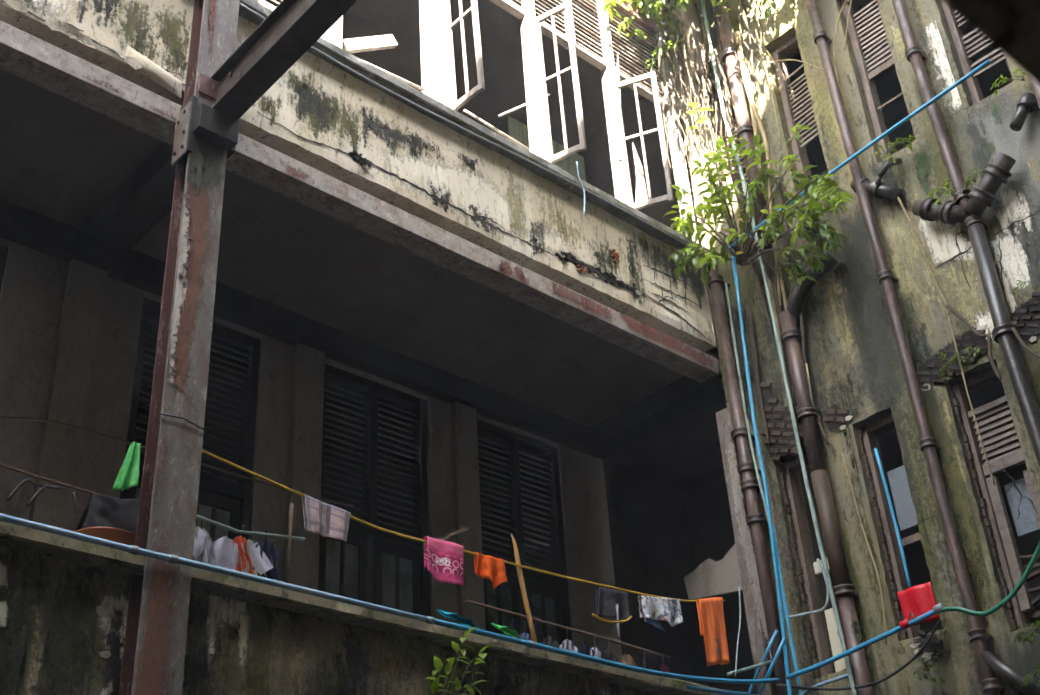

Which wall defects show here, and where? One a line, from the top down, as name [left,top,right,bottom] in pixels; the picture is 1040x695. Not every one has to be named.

peeling [4,0,100,47]
water stain [77,0,190,76]
peeling [926,20,962,112]
crack [257,111,556,256]
water stain [427,181,454,213]
peeling [347,147,642,295]
water stain [468,177,705,307]
water stain [725,286,798,426]
water stain [799,92,1040,497]
spalling [915,310,994,391]
spalling [759,382,804,463]
water stain [0,556,125,695]